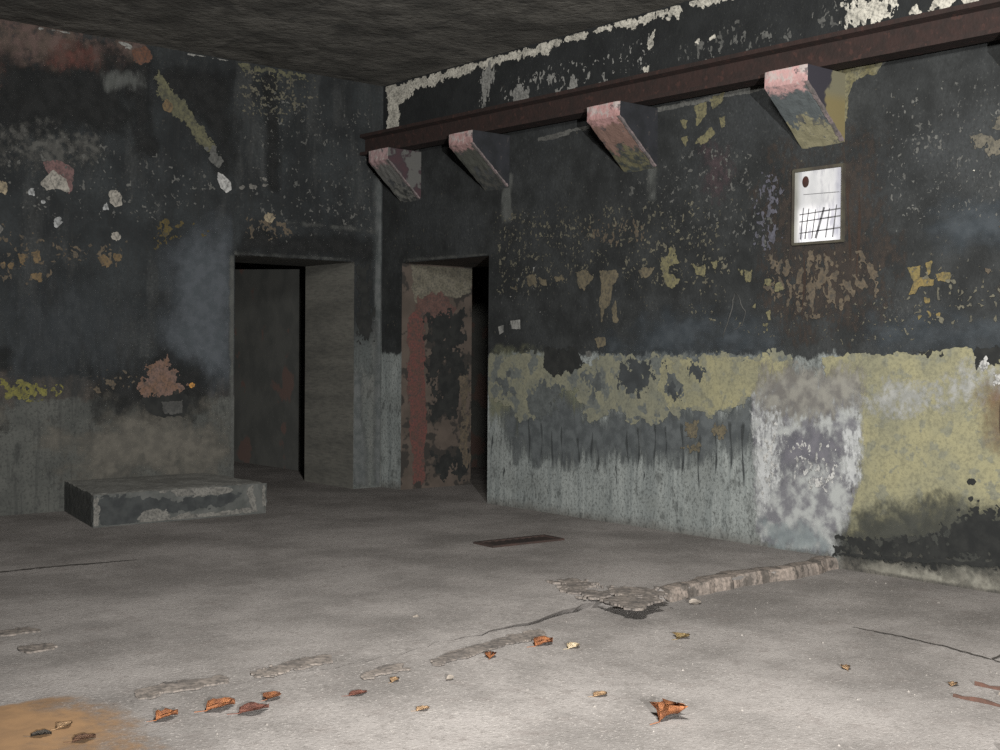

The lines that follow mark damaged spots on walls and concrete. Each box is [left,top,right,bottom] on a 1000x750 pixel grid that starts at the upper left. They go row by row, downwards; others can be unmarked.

peeling [119,41,152,65]
peeling [386,0,727,129]
peeling [678,20,802,61]
peeling [0,53,377,285]
peeling [488,79,1000,537]
spalling [660,556,839,602]